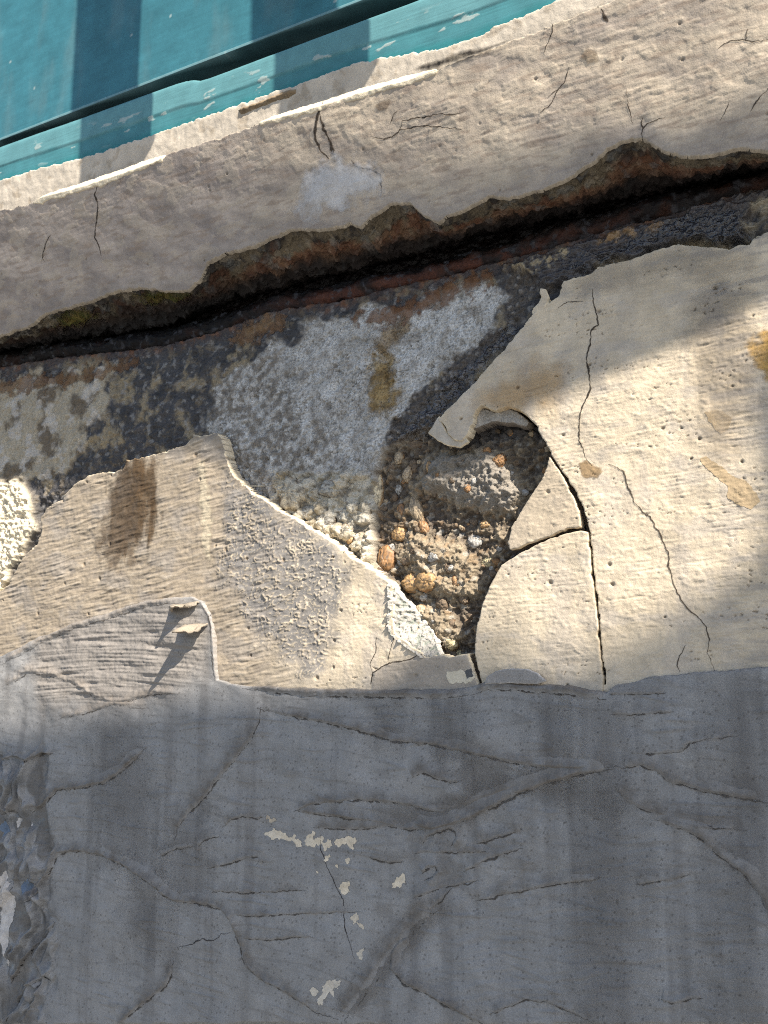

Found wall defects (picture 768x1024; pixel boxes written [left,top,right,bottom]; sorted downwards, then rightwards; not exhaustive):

crack [418,41,506,70]
crack [313,102,382,192]
rust [229,312,287,345]
spalling [0,141,768,658]
rust [351,269,492,411]
rust [748,331,768,379]
water stain [98,472,136,566]
crack [558,289,715,671]
crack [510,457,606,684]
peeling [264,815,357,873]
peeling [392,873,405,888]
peeling [309,979,341,1005]